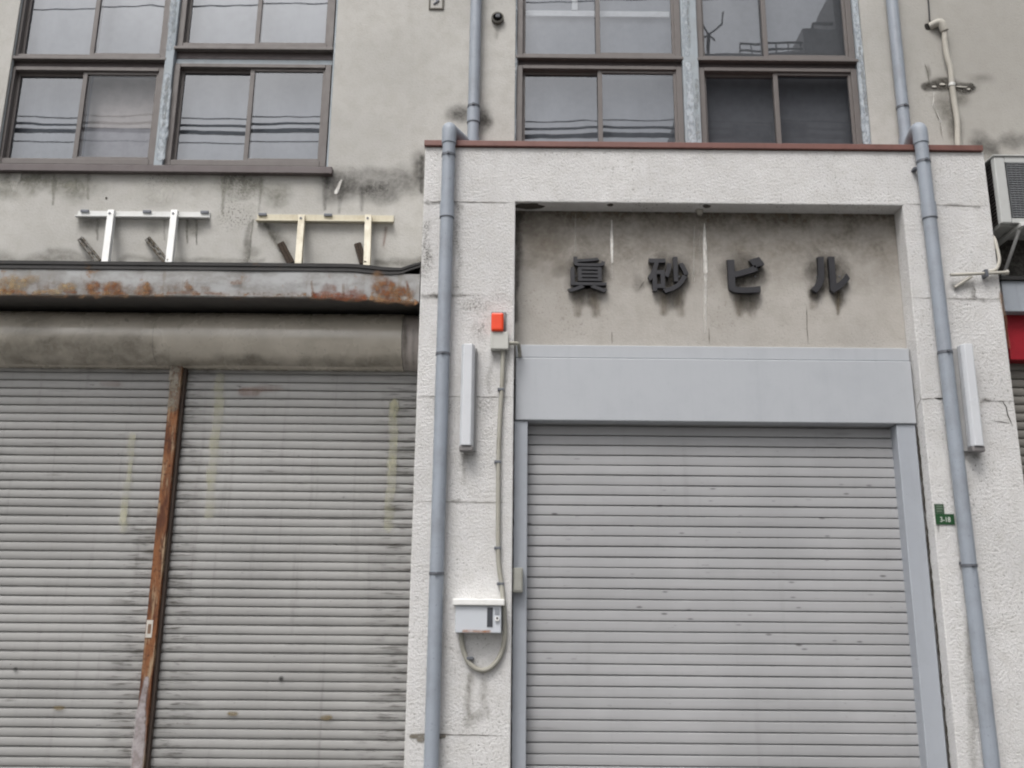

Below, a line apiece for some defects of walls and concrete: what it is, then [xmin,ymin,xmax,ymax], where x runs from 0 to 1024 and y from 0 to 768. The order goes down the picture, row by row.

damp [326,176,384,195]
damp [693,223,708,282]
rust [0,276,168,298]
rust [298,273,418,305]